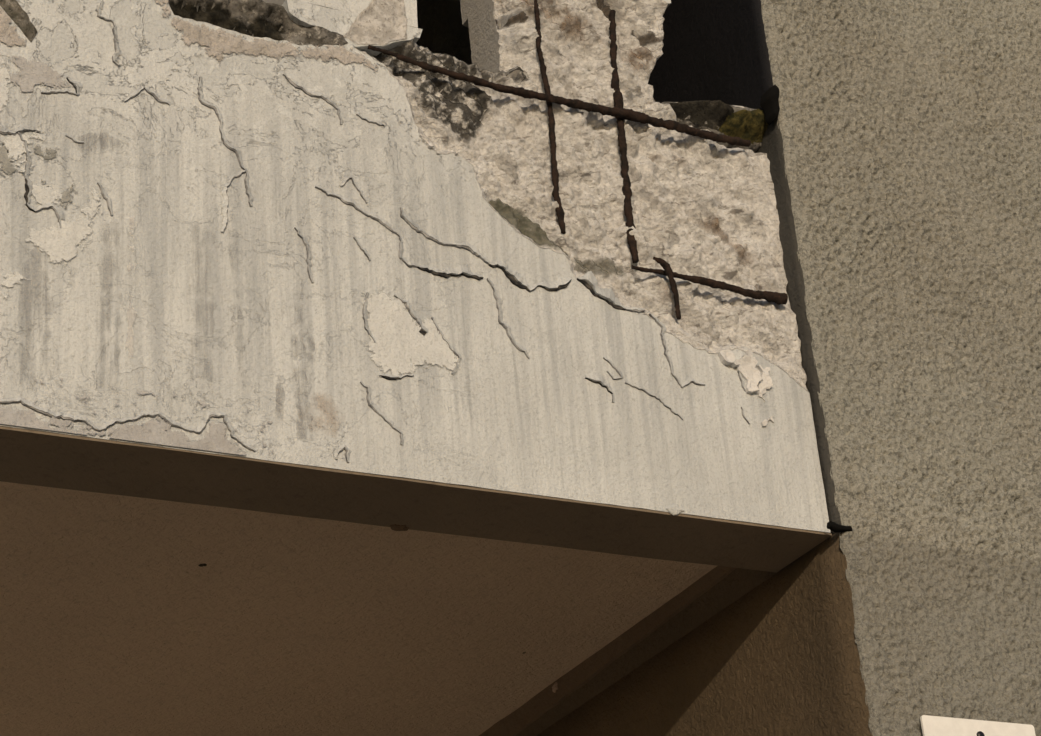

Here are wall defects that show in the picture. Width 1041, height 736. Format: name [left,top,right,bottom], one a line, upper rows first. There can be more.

spalling [0,0,37,112]
crack [0,122,65,228]
peeling [0,128,103,264]
crack [95,0,121,66]
crack [197,76,253,233]
crack [282,73,384,126]
spalling [155,0,809,401]
rust [368,0,788,320]
crack [315,176,705,420]
peeling [0,390,247,455]
crack [0,397,256,452]
crack [360,358,414,445]